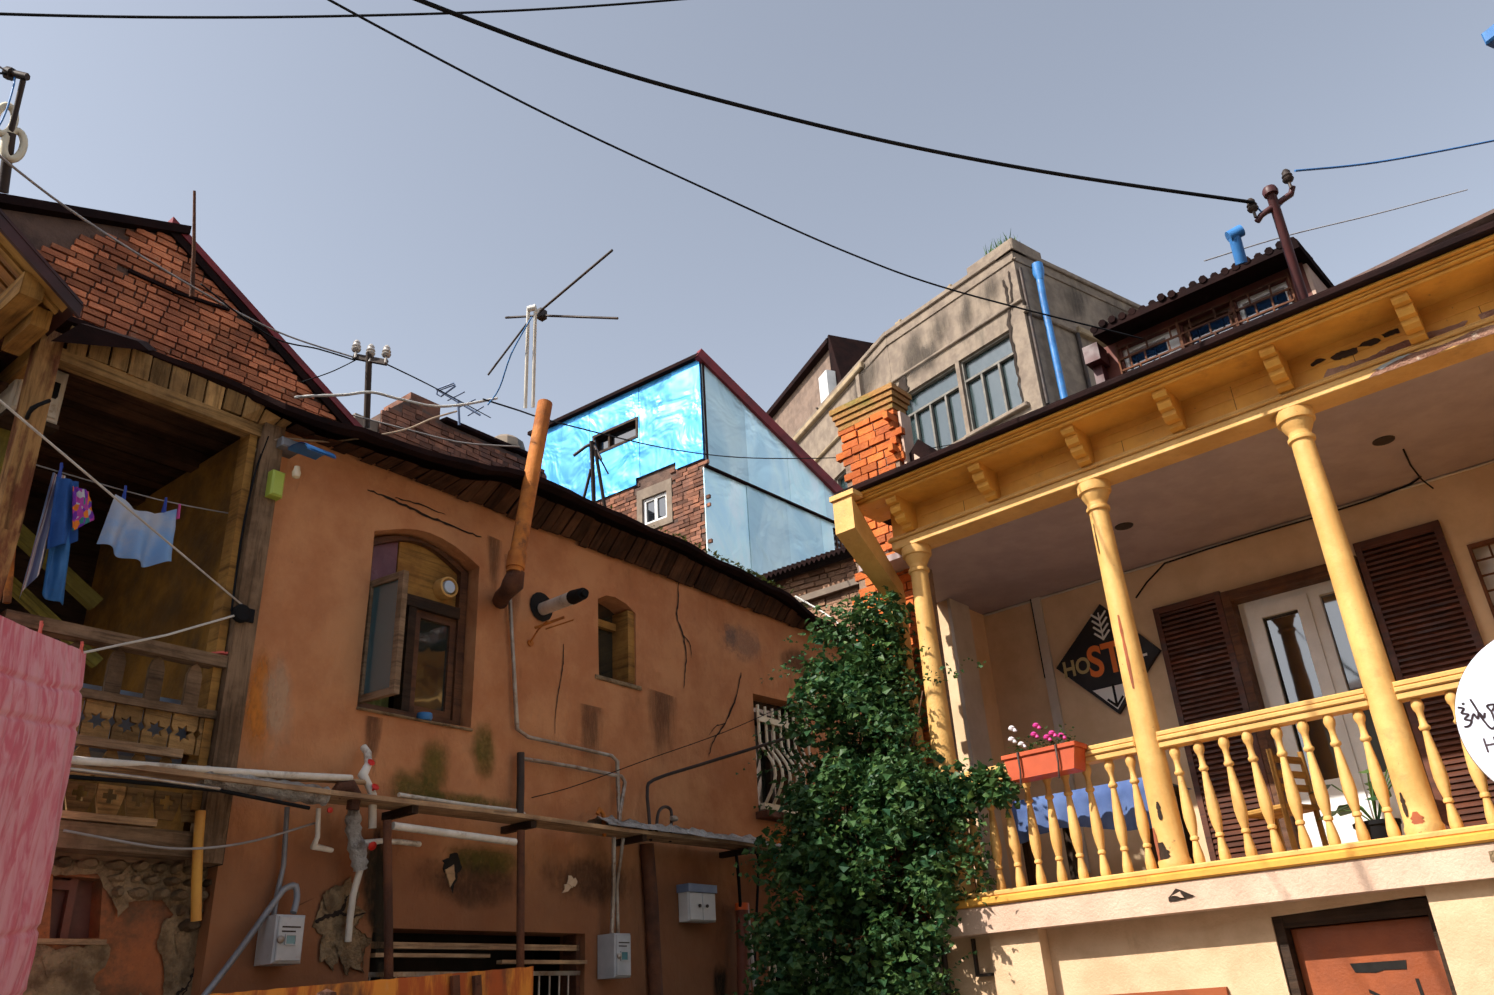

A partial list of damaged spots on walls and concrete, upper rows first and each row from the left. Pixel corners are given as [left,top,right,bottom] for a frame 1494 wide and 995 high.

peeling [1310,309,1494,379]
crack [368,490,481,537]
crack [676,583,692,686]
spalling [23,943,111,995]
spalling [157,901,204,995]
spalling [312,876,372,975]